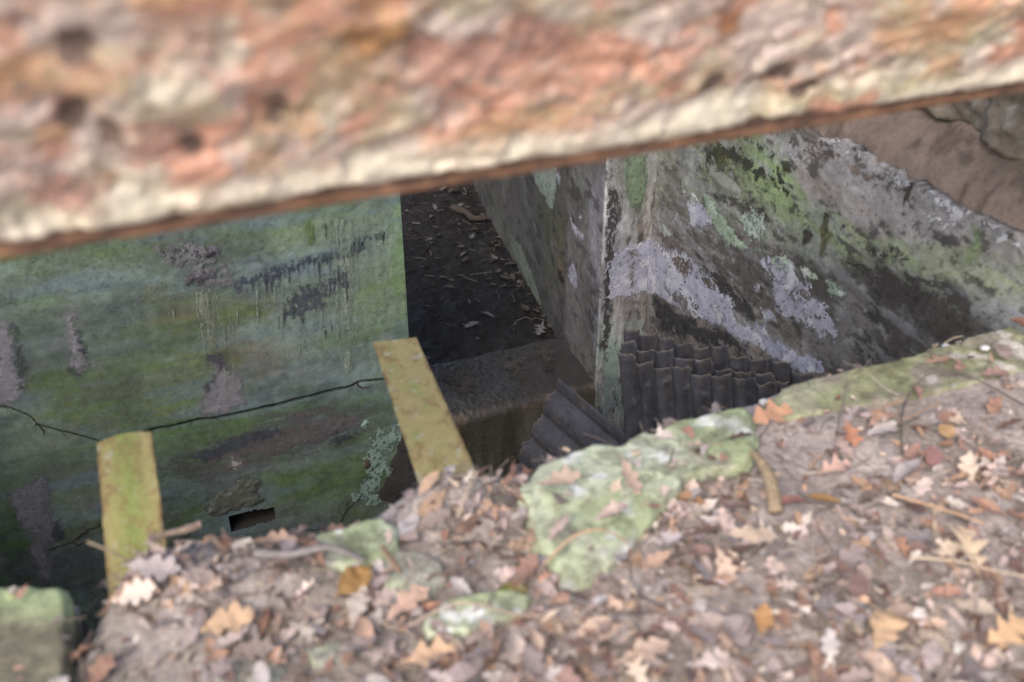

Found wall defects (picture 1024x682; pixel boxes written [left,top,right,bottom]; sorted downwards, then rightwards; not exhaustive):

damp [196,219,388,392]
crack [5,406,99,441]
crack [142,378,384,432]